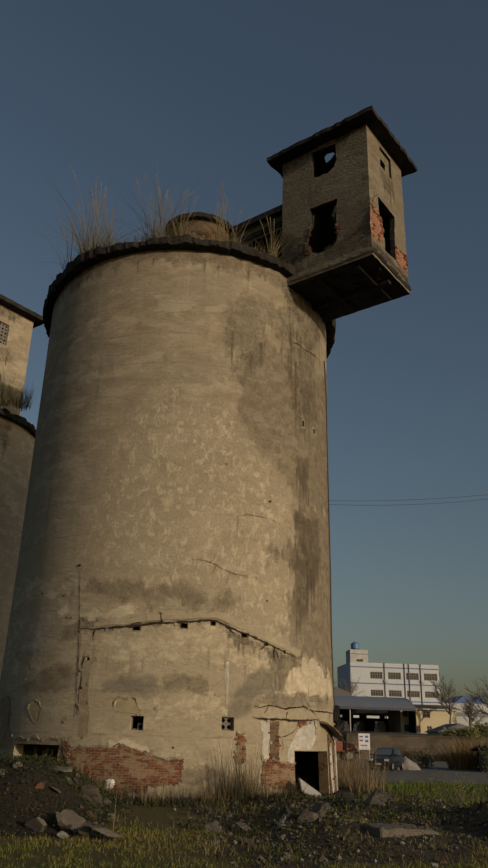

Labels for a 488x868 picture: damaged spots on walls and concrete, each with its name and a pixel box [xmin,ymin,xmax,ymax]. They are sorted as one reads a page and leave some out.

spalling [370,202,384,243]
spalling [396,244,409,275]
peeling [57,378,297,675]
crack [74,564,301,725]
spalling [14,699,184,797]
peeling [152,688,229,722]
spalling [234,730,247,764]
crack [253,705,334,747]
spalling [260,720,338,793]